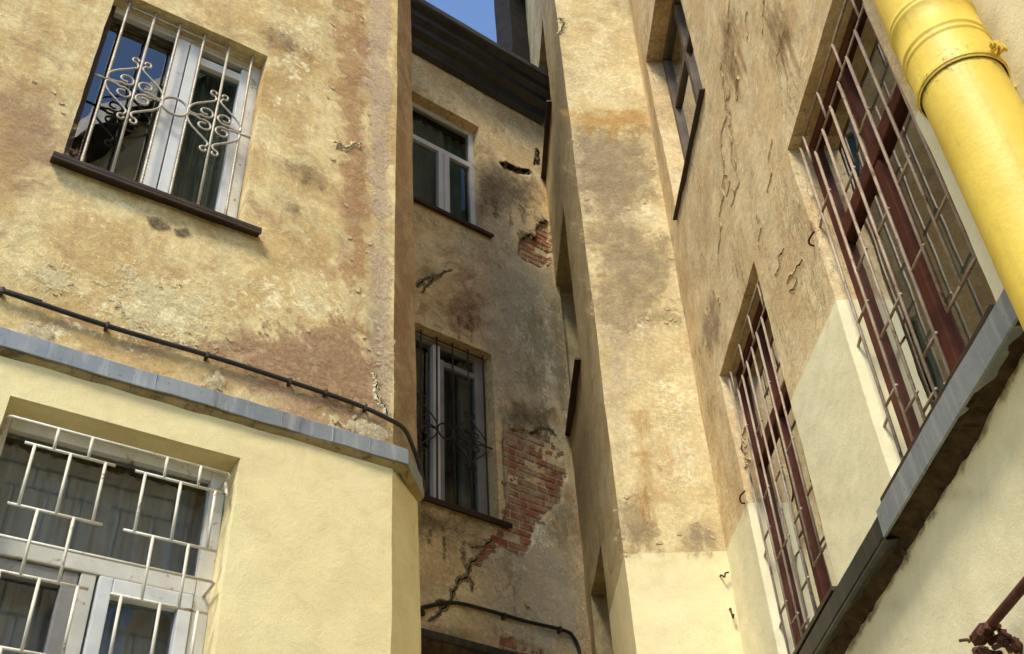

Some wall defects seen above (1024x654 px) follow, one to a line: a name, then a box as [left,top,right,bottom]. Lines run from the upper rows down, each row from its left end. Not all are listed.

peeling [327,0,375,293]
crack [717,0,803,294]
flaking render [517,214,553,268]
crack [370,372,392,415]
flaking render [475,405,567,567]
crack [428,534,495,622]